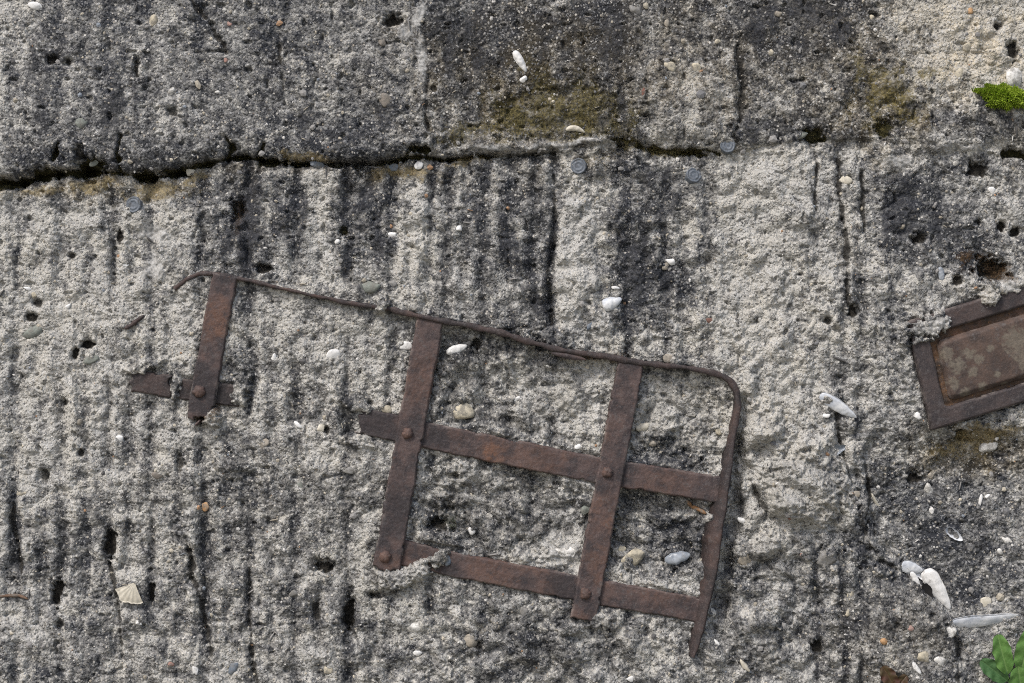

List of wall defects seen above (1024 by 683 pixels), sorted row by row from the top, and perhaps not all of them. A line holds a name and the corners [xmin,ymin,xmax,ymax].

crack [370,75,497,166]
water stain [477,98,625,156]
crack [18,134,345,187]
water stain [880,156,914,167]
water stain [139,225,169,241]
water stain [143,254,164,280]